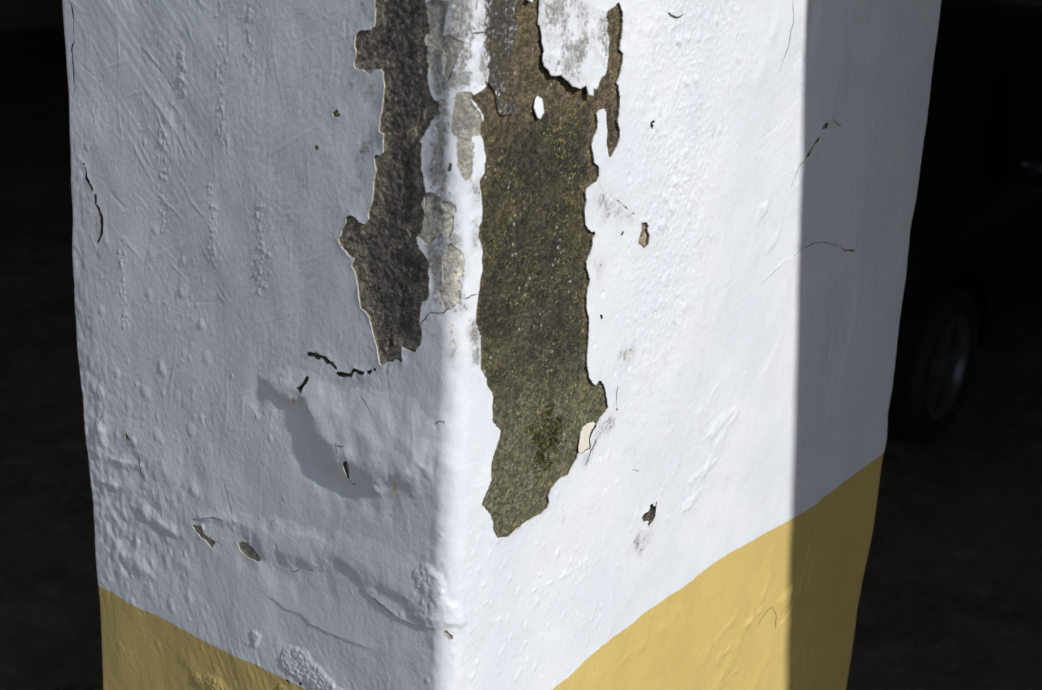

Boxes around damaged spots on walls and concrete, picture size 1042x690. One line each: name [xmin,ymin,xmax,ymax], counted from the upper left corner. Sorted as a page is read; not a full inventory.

crack [68,2,76,83]
crack [790,119,841,189]
crack [74,146,103,254]
peeling [638,222,650,248]
spalling [338,0,623,538]
crack [289,352,376,417]
peeling [193,517,223,548]
peeling [238,541,261,561]
spalling [642,502,657,526]